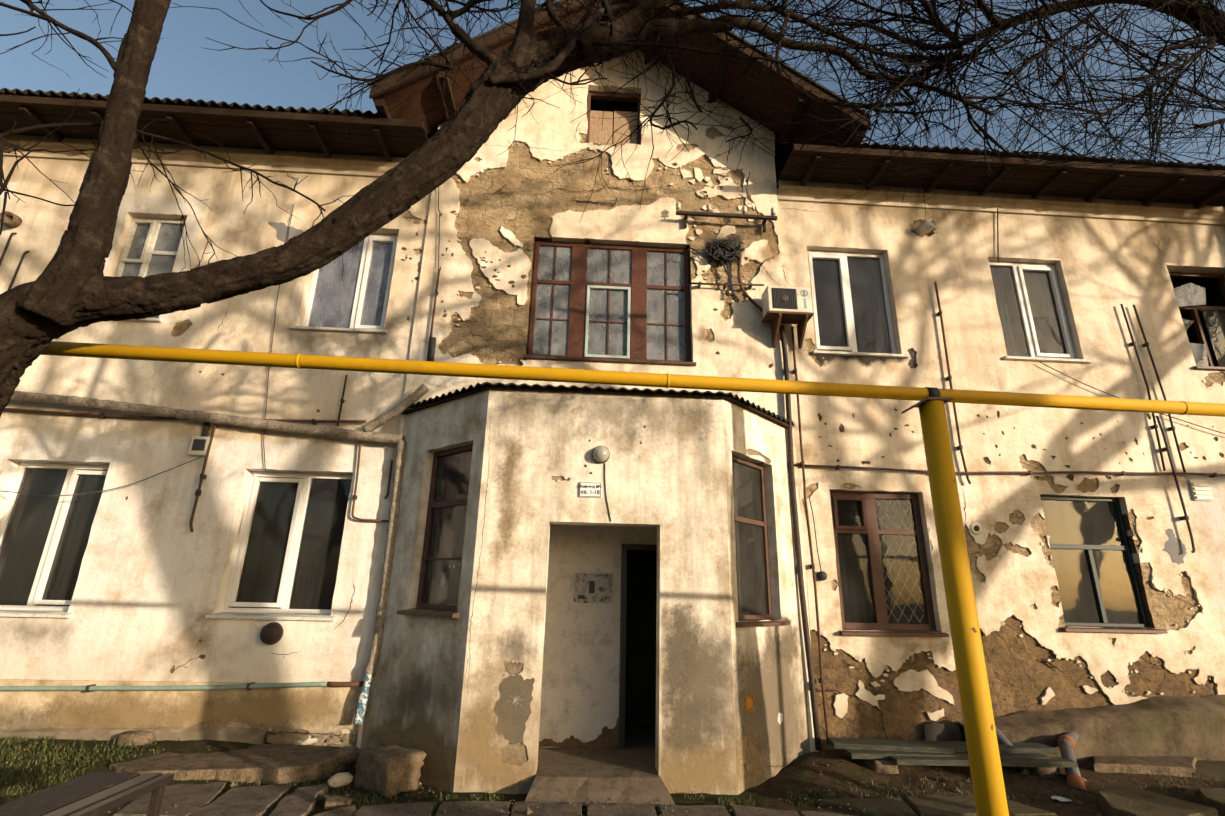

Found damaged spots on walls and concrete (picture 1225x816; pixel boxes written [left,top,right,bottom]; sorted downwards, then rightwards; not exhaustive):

flaking render [400,127,780,366]